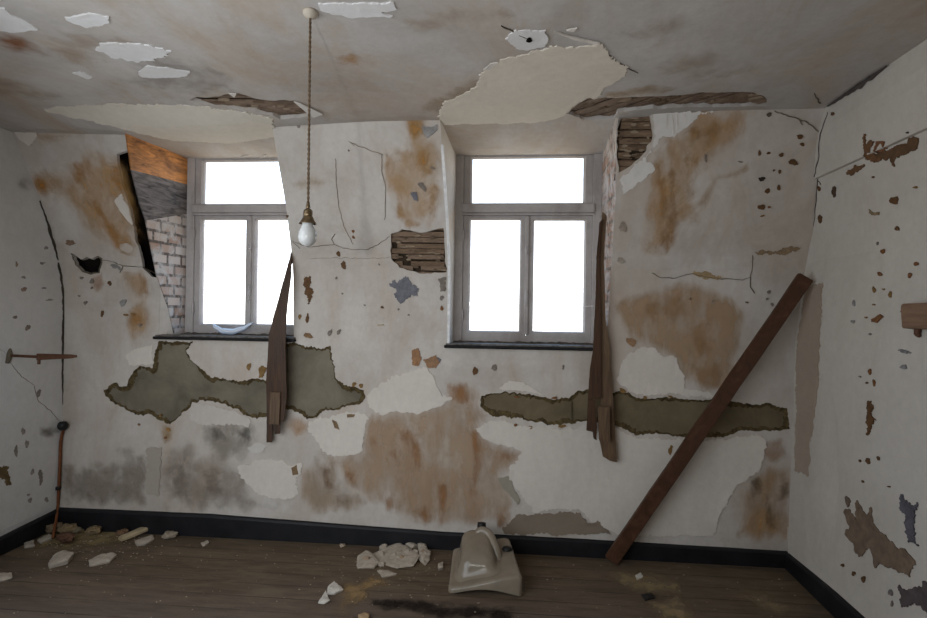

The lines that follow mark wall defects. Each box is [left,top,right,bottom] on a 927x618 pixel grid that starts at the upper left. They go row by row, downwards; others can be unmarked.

peeling [44,93,323,144]
peeling [421,27,772,194]
crack [774,65,889,226]
crack [1,201,64,422]
spalling [104,334,267,439]
spalling [286,276,452,457]
spalling [389,228,447,316]
damp [344,410,508,520]
peeling [476,338,714,537]
damp [621,288,740,383]
peeling [638,283,824,537]
peeling [843,494,927,613]